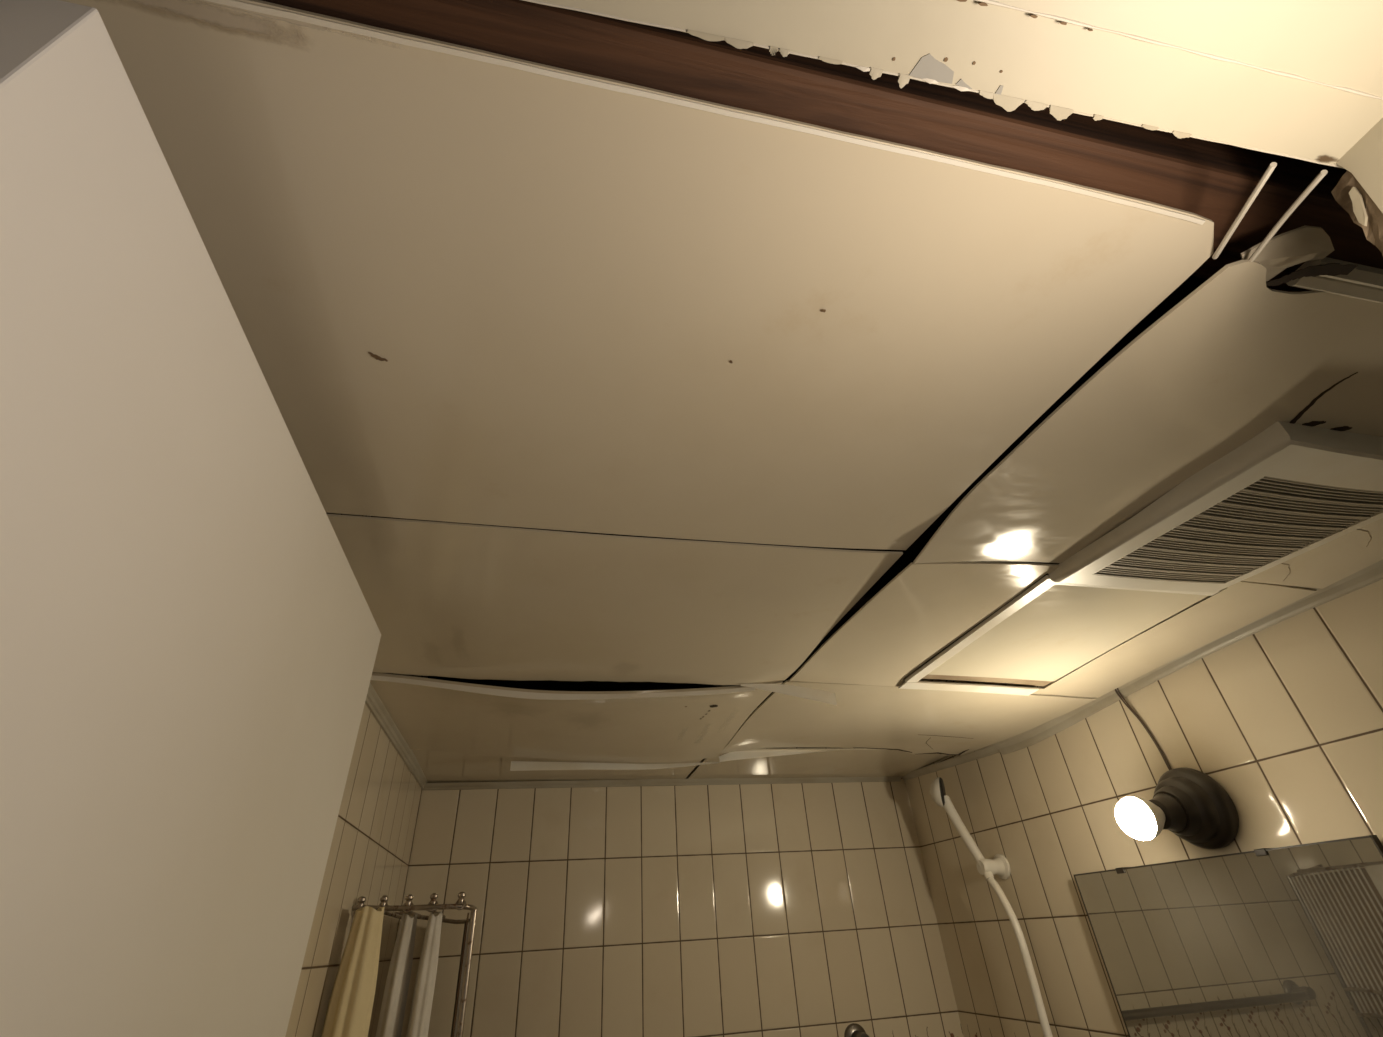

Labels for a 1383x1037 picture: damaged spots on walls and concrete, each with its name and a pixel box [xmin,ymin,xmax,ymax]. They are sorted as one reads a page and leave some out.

peeling [687,29,790,57]
peeling [818,53,1074,121]
peeling [1142,124,1192,139]
flaking render [1331,170,1383,256]